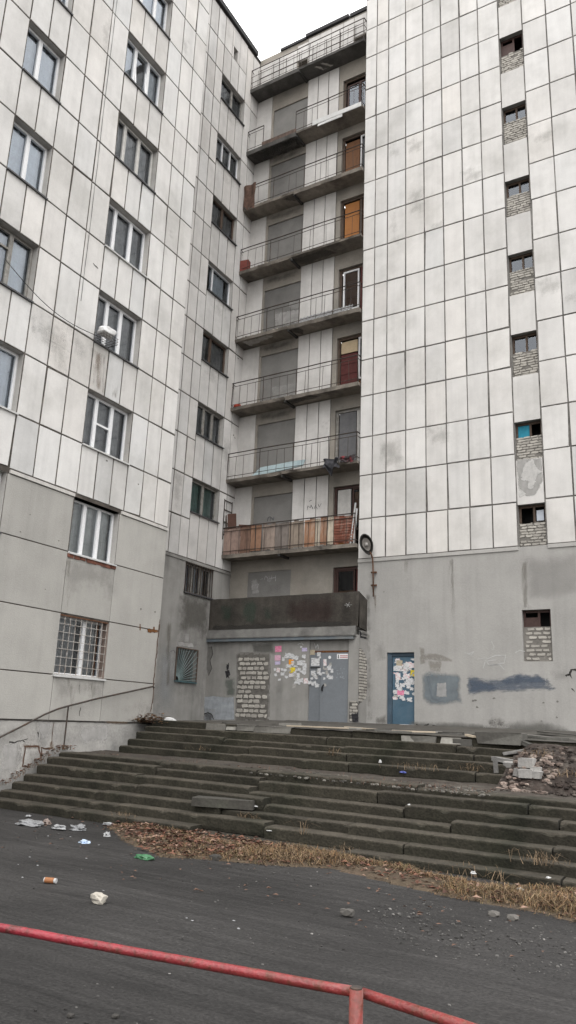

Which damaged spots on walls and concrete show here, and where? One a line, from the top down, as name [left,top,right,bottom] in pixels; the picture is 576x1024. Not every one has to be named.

peeling [517,459,542,497]